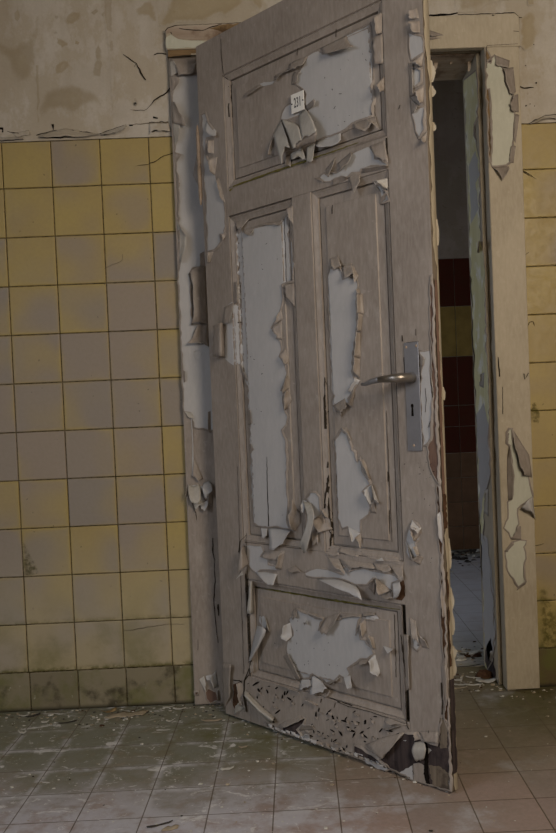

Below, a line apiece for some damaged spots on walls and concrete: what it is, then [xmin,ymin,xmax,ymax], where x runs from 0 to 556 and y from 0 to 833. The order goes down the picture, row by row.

crack [165,22,241,34]
flaking render [0,124,133,141]
crack [133,88,170,125]
crack [221,55,233,118]
peeling [408,9,443,143]
peeling [149,12,423,673]
peeling [194,48,556,769]